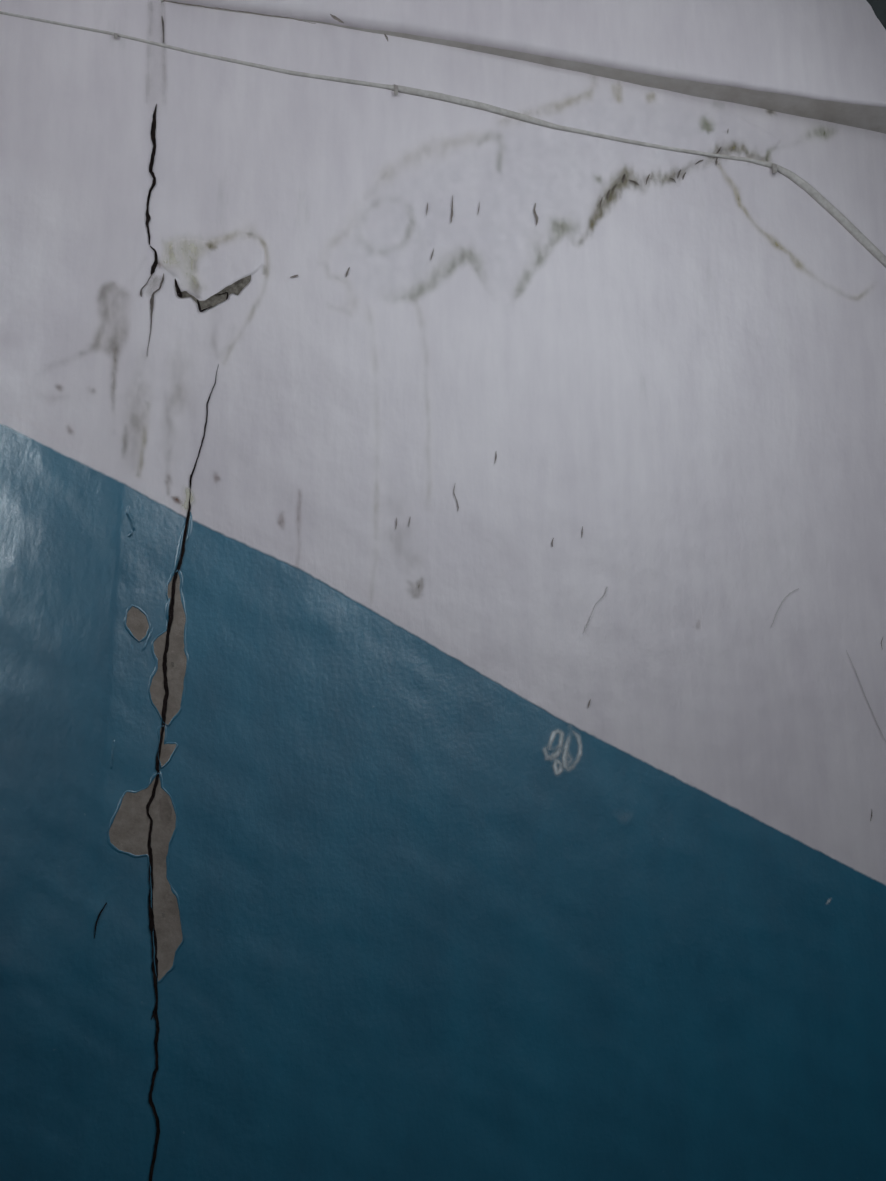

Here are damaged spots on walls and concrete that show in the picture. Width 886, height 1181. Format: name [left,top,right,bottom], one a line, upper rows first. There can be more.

crack [140,104,164,351]
spalling [174,275,251,312]
water stain [590,171,650,228]
peeling [107,570,189,983]
crack [146,364,219,1181]
crack [94,902,107,939]